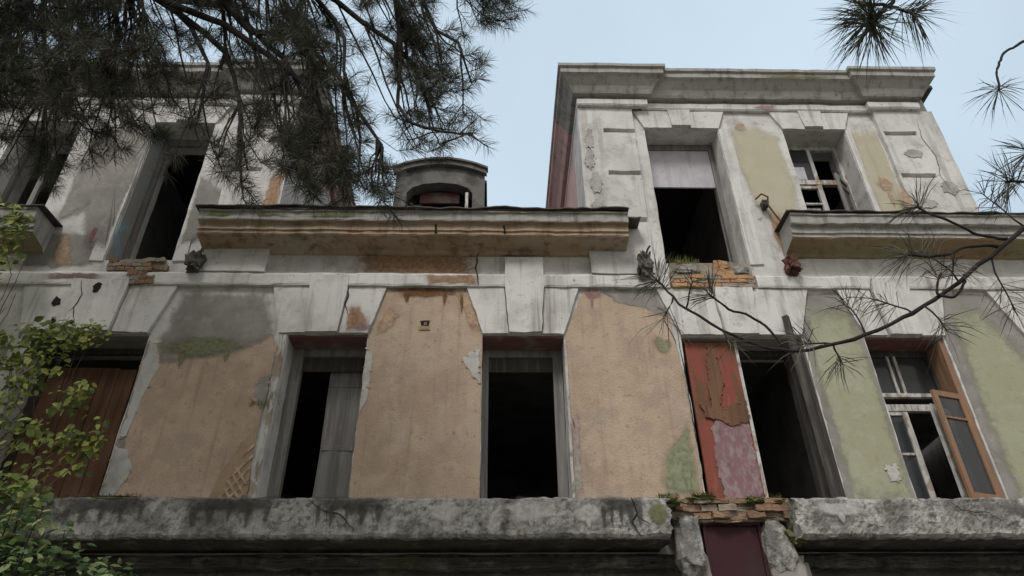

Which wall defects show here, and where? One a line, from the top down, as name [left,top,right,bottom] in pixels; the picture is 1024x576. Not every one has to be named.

spalling [914,181,960,208]
spalling [92,257,169,293]
spalling [669,260,756,289]
peeling [359,347,373,413]
peeling [462,349,481,384]
peeling [699,345,751,426]
peeling [100,341,161,496]
peeling [884,462,903,482]
water stain [60,496,149,526]
water stain [189,497,270,525]
water stain [315,497,387,526]
crack [631,498,651,535]